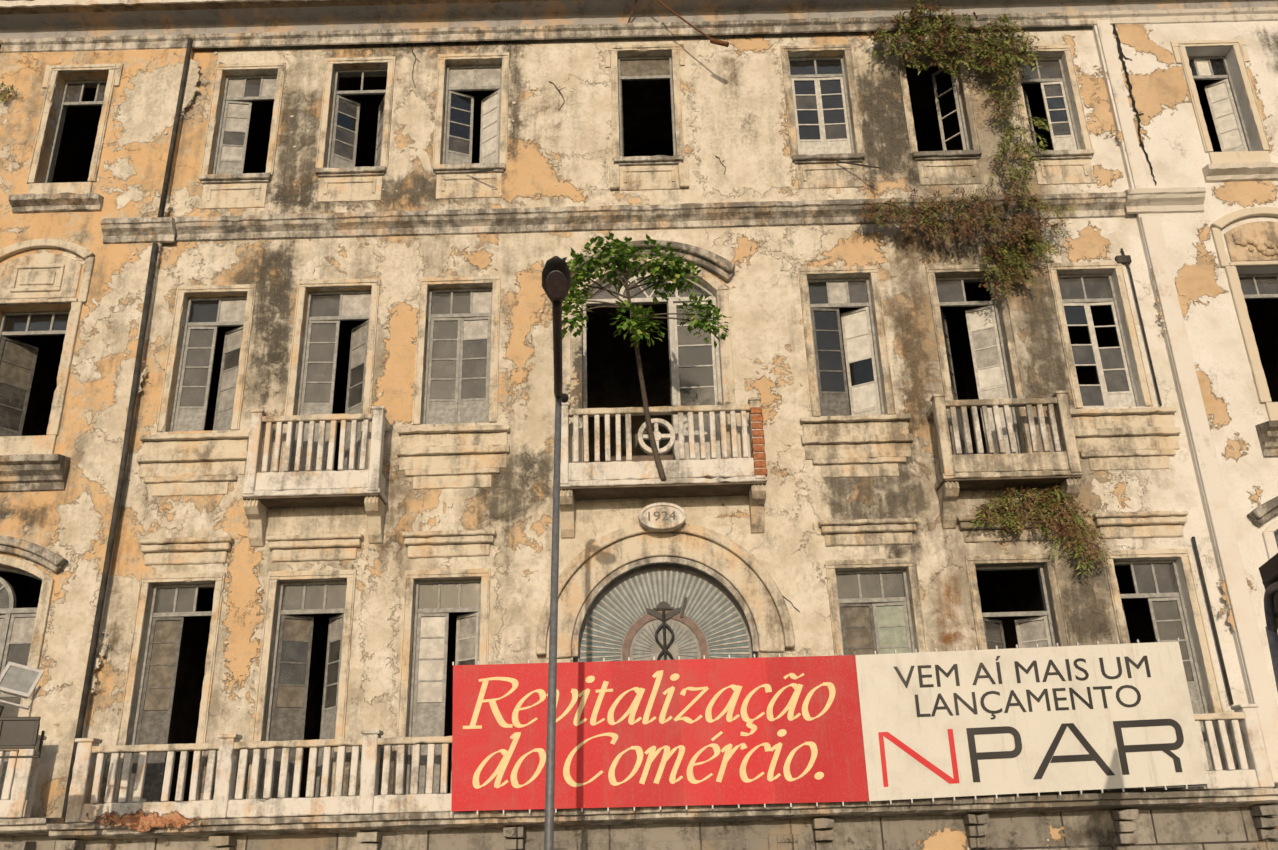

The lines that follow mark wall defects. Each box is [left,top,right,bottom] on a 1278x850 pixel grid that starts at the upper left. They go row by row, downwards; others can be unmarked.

peeling [476,38,612,203]
flaking render [1063,24,1191,151]
flaking render [731,234,763,272]
flaking render [777,226,888,272]
flaking render [1175,220,1229,321]
flaking render [371,239,428,427]
flaking render [220,535,267,687]
spalling [86,808,205,834]
flaking render [915,827,971,850]